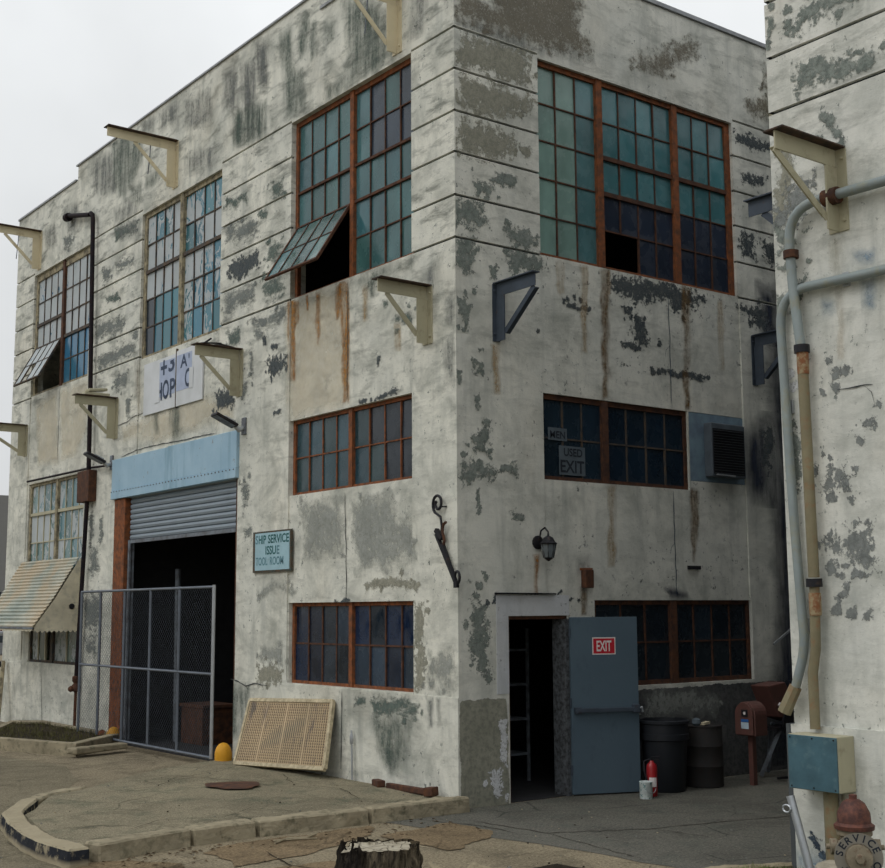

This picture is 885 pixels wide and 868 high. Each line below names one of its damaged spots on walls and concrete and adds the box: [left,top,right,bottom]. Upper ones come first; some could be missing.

leakage [224,46,265,143]
leakage [282,17,314,111]
peeling [454,0,592,164]
peeling [765,0,857,51]
leakage [95,139,140,192]
peeling [221,238,288,383]
rust [288,295,320,379]
rust [336,282,349,397]
rust [600,270,610,396]
peeling [606,273,707,352]
leakage [748,342,792,688]
peeling [818,518,883,621]